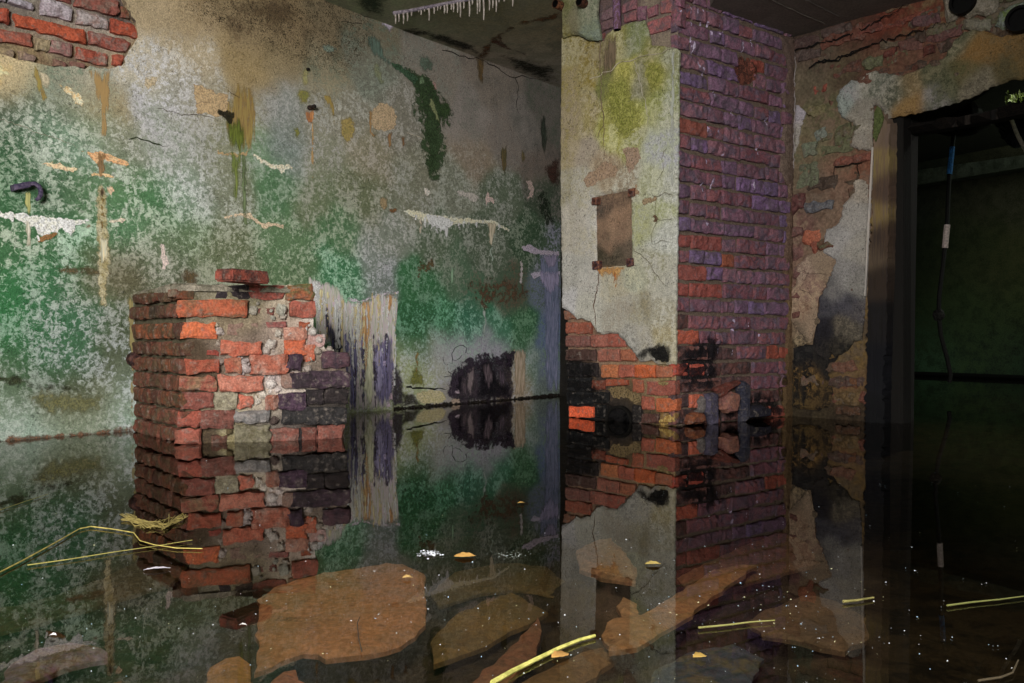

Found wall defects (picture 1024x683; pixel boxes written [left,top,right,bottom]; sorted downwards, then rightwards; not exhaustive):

flaking render [0,0,138,69]
rust [91,71,109,135]
flaking render [194,84,228,117]
flaking render [369,103,404,147]
crack [442,50,535,114]
crack [773,0,950,167]
leakage [0,151,129,306]
leakage [218,120,293,229]
leakage [404,209,509,269]
flaking render [791,0,1024,416]
leakage [309,244,560,410]